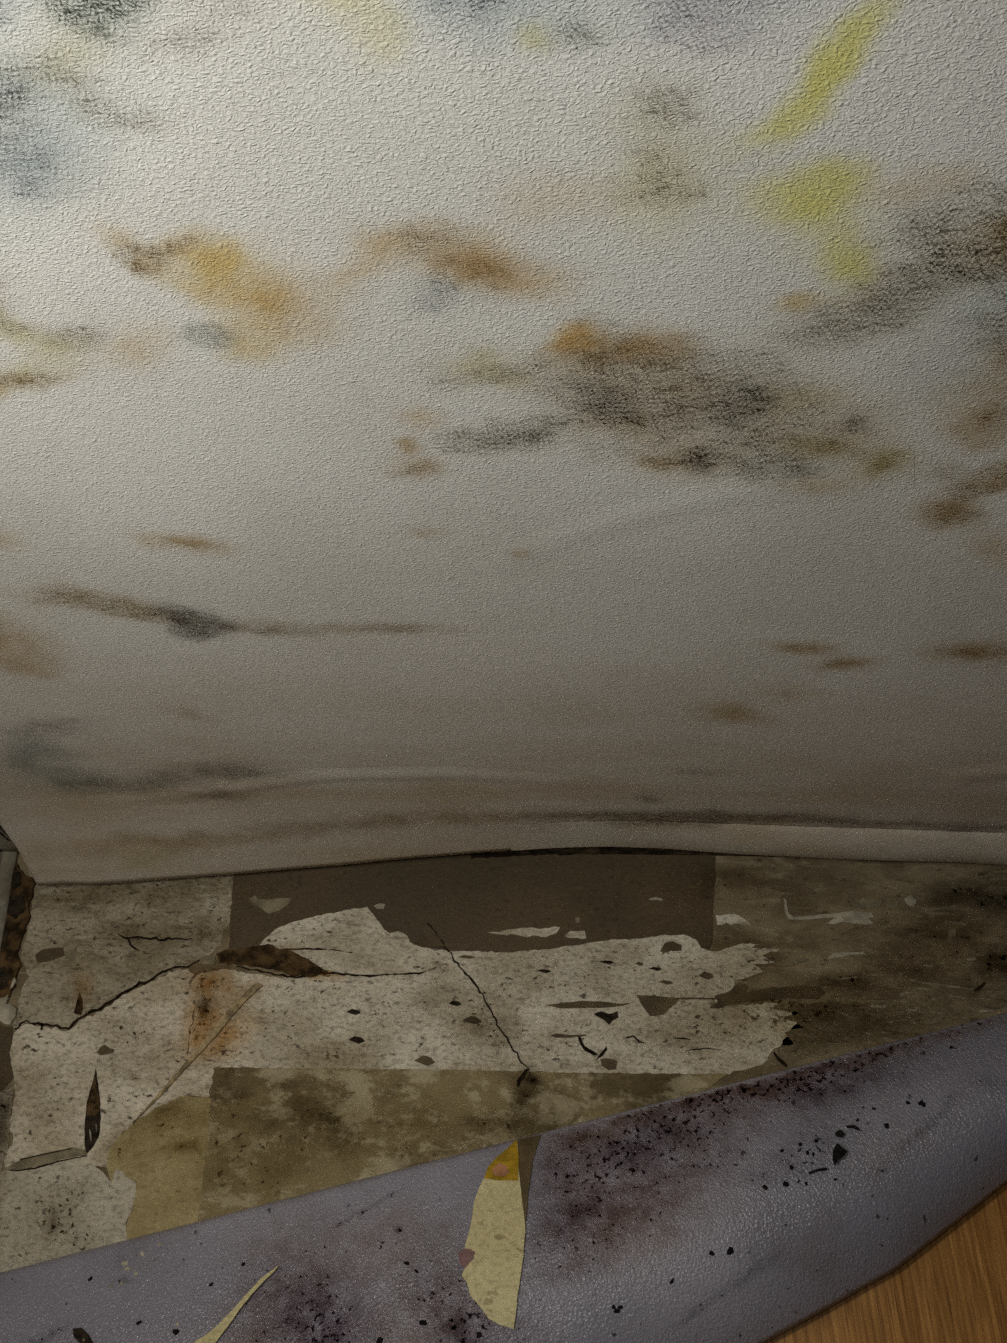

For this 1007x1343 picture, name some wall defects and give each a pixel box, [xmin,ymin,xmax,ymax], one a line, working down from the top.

leakage [51,0,148,38]
leakage [114,237,192,276]
leakage [783,183,1007,364]
leakage [438,333,896,485]
leakage [33,586,234,642]
peeling [0,977,18,1025]
crack [14,934,200,1030]
crack [236,923,533,1087]
peeling [449,1000,481,1024]
peeling [546,941,825,1025]
peeling [414,1056,435,1066]
peeling [550,1033,617,1070]